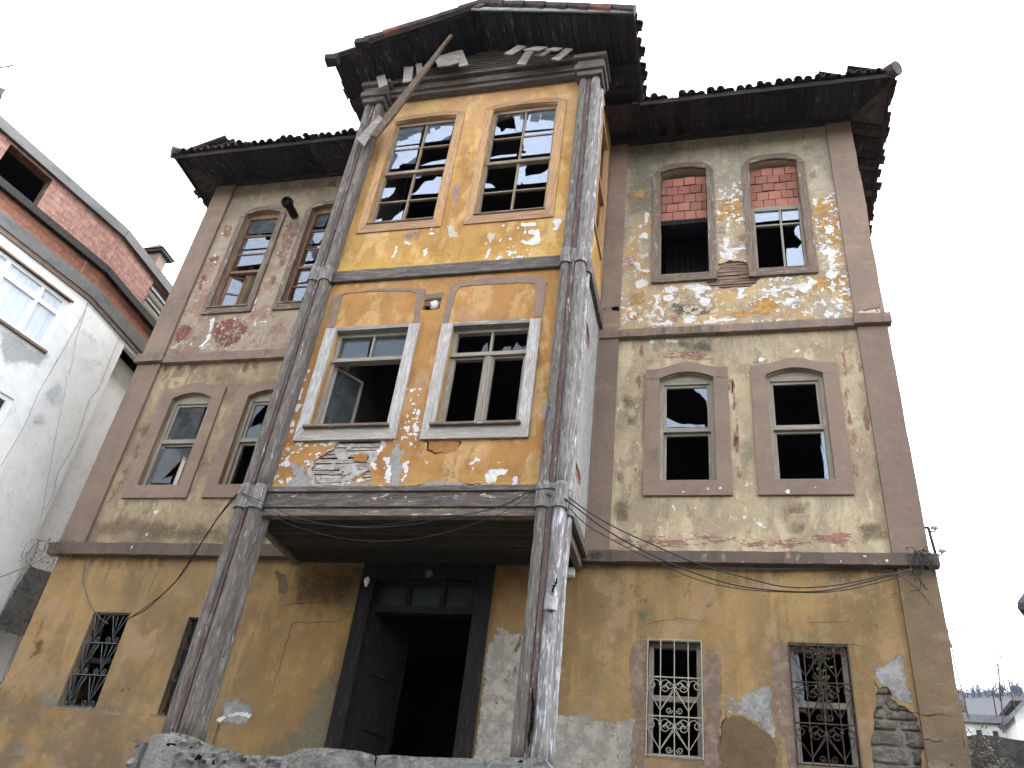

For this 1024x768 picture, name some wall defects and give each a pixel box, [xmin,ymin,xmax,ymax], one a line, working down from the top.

peeling [391,228,434,258]
peeling [484,222,541,260]
peeling [611,182,881,326]
peeling [171,298,270,350]
flaking render [274,369,340,497]
flaking render [217,699,252,725]
flaking render [474,627,523,763]
flaking render [724,641,797,768]
flaking render [871,656,924,768]